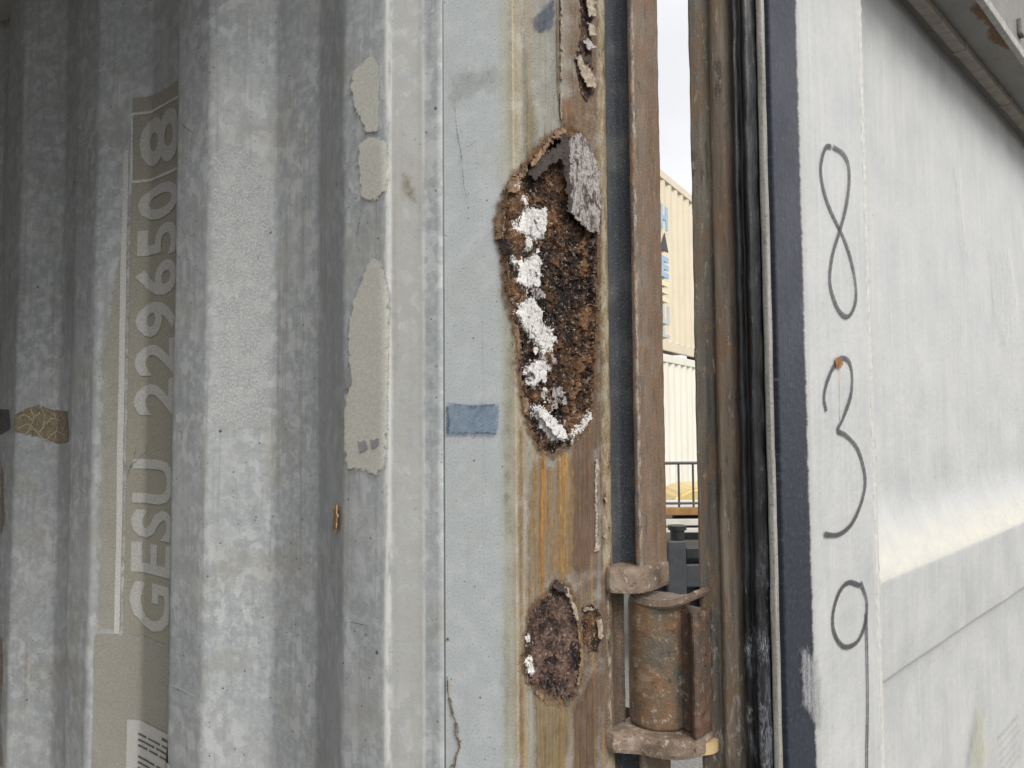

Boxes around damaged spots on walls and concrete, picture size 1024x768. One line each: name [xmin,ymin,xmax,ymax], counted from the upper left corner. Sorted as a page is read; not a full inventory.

peeling [349,55,389,203]
peeling [343,255,392,476]
corrosion [493,0,604,768]
crack [447,677,461,768]